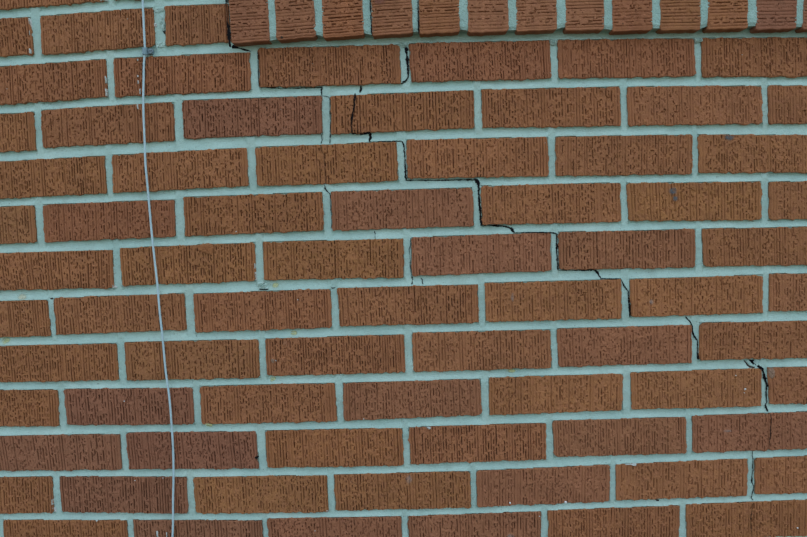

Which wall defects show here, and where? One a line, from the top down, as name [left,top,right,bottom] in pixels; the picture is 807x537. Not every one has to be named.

crack [401,2,420,84]
crack [257,51,332,228]
crack [351,86,631,317]
crack [685,316,699,360]
crack [750,363,772,533]